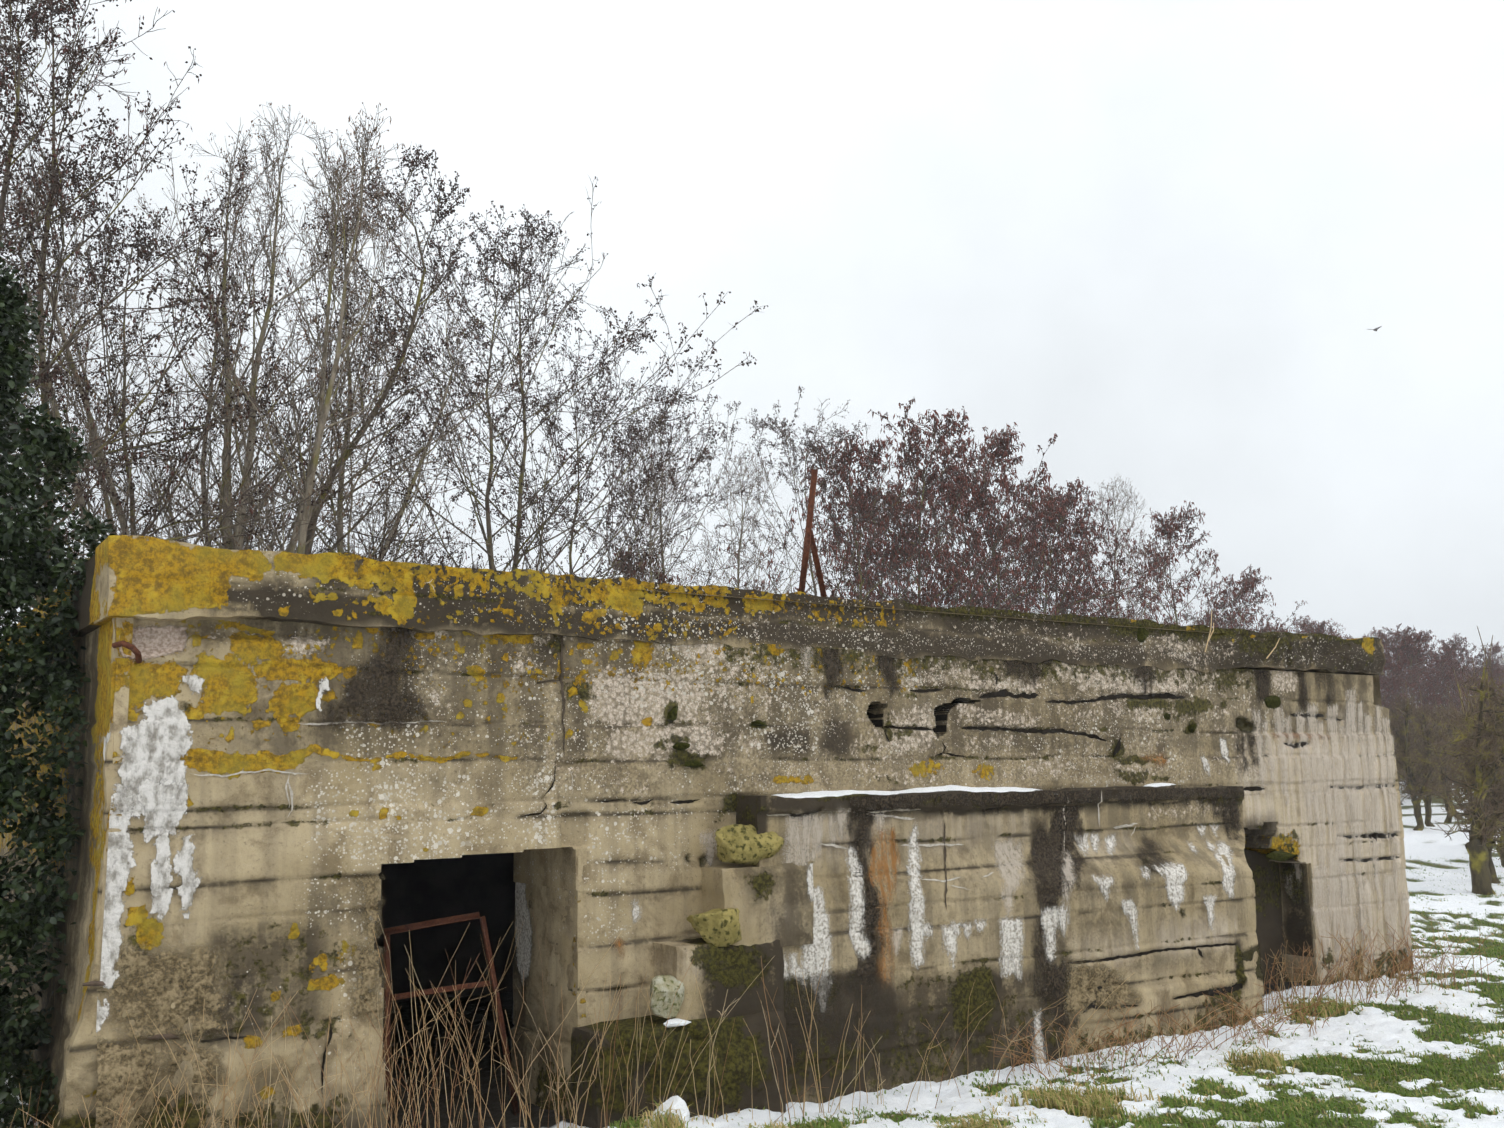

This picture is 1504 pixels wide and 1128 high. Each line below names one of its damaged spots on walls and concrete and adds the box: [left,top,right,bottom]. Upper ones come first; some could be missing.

spalling [867,704,886,731]
spalling [932,698,978,738]
crack [883,673,1185,757]
crack [1063,792,1138,849]
rust [868,829,900,986]
leakage [783,670,1411,1067]